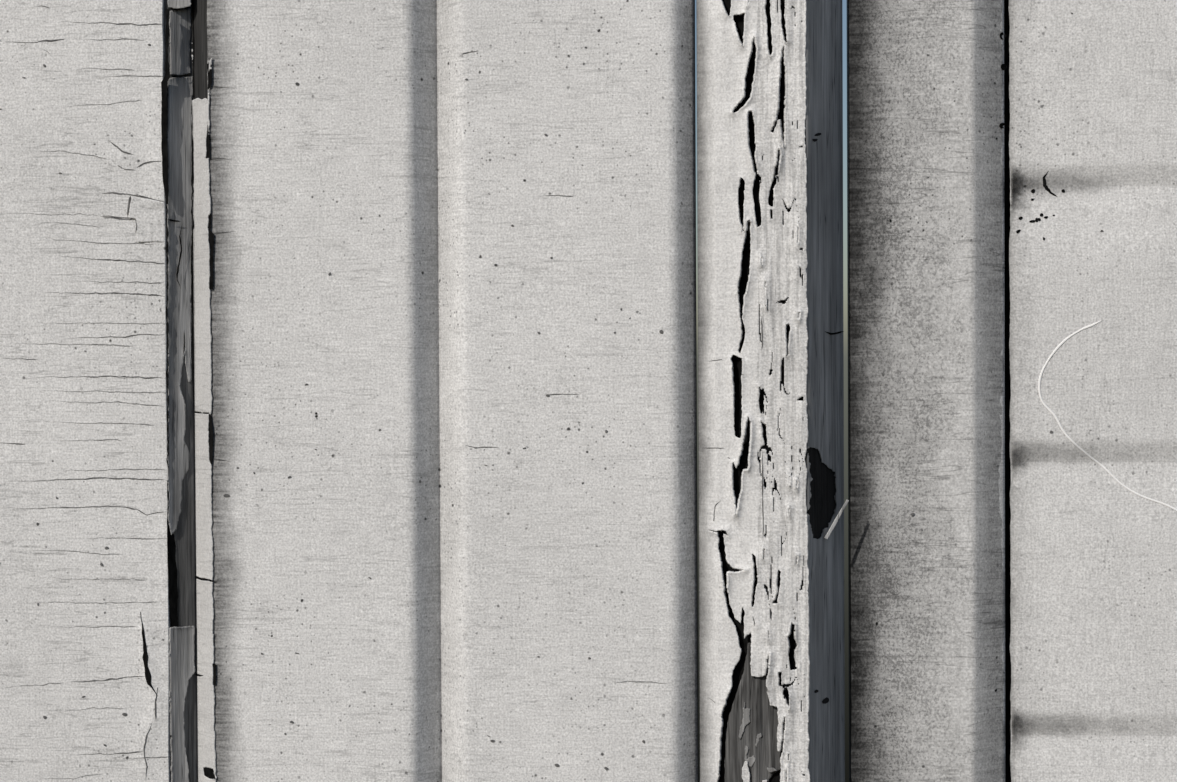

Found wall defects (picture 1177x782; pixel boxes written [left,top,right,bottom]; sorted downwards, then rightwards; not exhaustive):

crack [8,142,209,779]
peeling [807,447,849,539]
peeling [724,642,782,782]